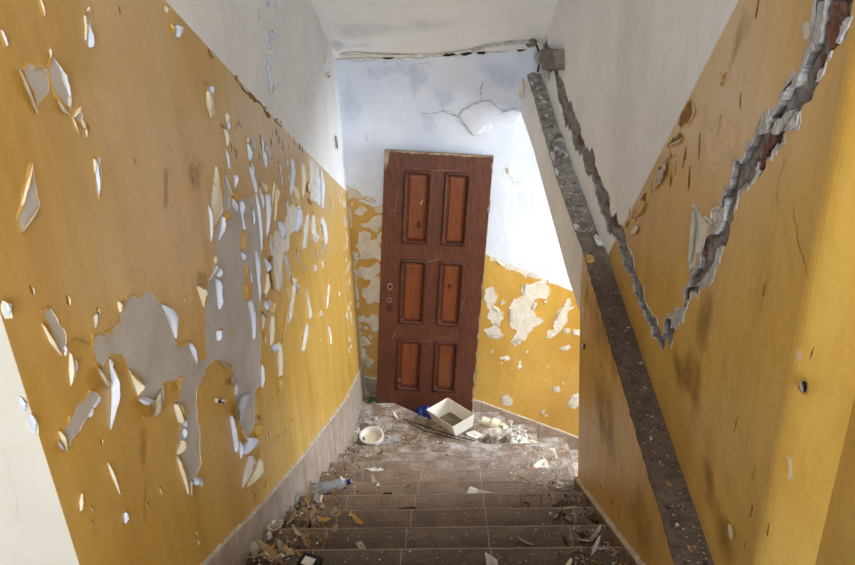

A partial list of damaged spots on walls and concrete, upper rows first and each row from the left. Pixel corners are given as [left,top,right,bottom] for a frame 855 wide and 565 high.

peeling [18,48,90,137]
crack [335,37,550,66]
peeling [15,161,41,236]
peeling [624,96,701,234]
crack [551,0,854,349]
peeling [1,300,13,319]
peeling [39,75,383,500]
peeling [483,256,589,370]
peeling [17,397,39,433]
spalling [798,376,810,395]